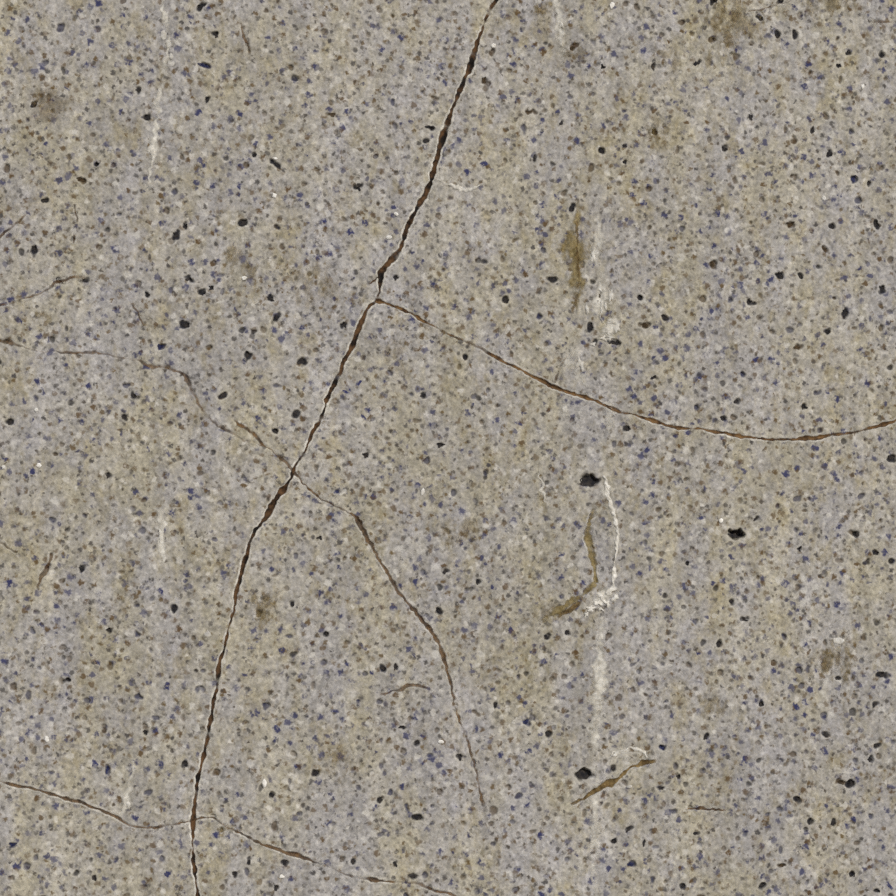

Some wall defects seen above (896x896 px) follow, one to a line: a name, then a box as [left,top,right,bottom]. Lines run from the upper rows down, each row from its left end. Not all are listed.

crack [481,347,896,442]
crack [4,0,501,896]
crack [552,512,598,616]
water stain [584,476,619,747]
water stain [591,767,599,828]
crack [571,760,656,804]
crack [688,804,724,812]